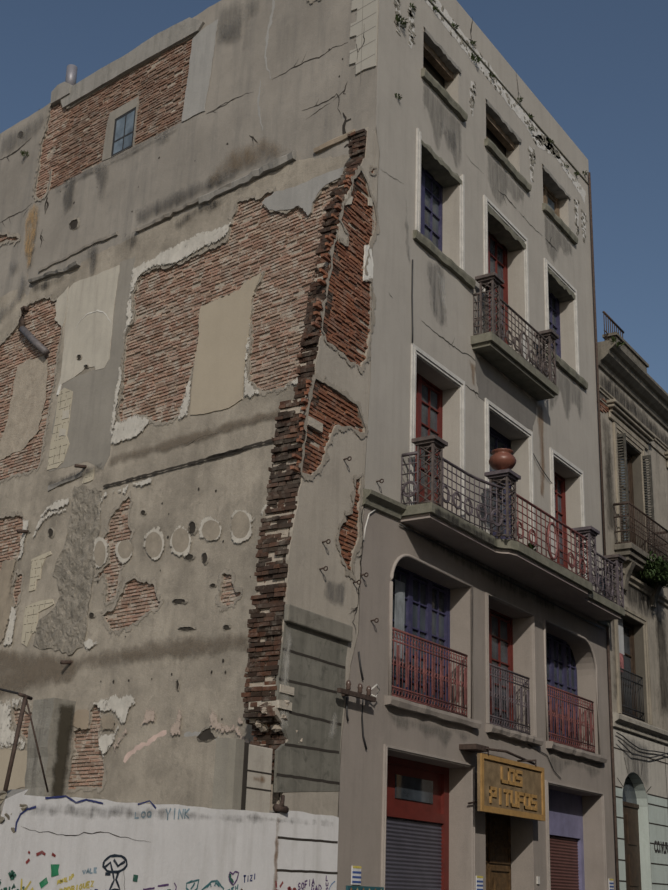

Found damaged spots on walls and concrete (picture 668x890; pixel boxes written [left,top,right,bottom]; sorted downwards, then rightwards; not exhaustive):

crack [273,34,365,79]
flaking render [394,0,416,49]
flaking render [32,101,71,202]
crack [302,81,351,147]
flaking render [425,0,588,244]
flaking render [110,163,380,481]
flaking render [0,294,63,483]
spalling [0,478,188,656]
peeling [0,697,33,749]
flaking render [66,694,136,793]
spalling [0,790,28,833]